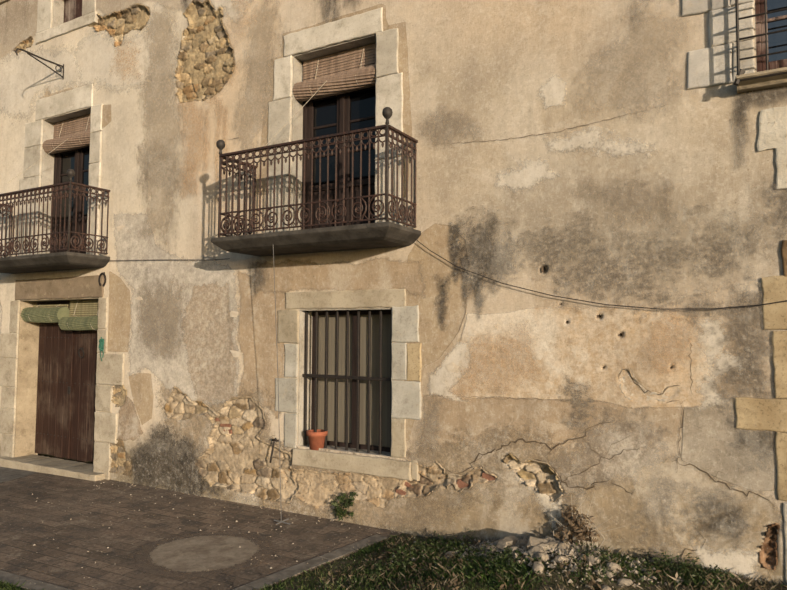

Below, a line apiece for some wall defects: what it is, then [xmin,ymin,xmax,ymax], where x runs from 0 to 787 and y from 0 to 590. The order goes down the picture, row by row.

spalling [0,0,252,121]
damp [138,13,188,235]
damp [435,213,757,324]
peeling [102,381,143,477]
peeling [114,213,592,531]
crack [448,422,642,494]
crack [618,334,775,507]
peeling [696,523,780,580]